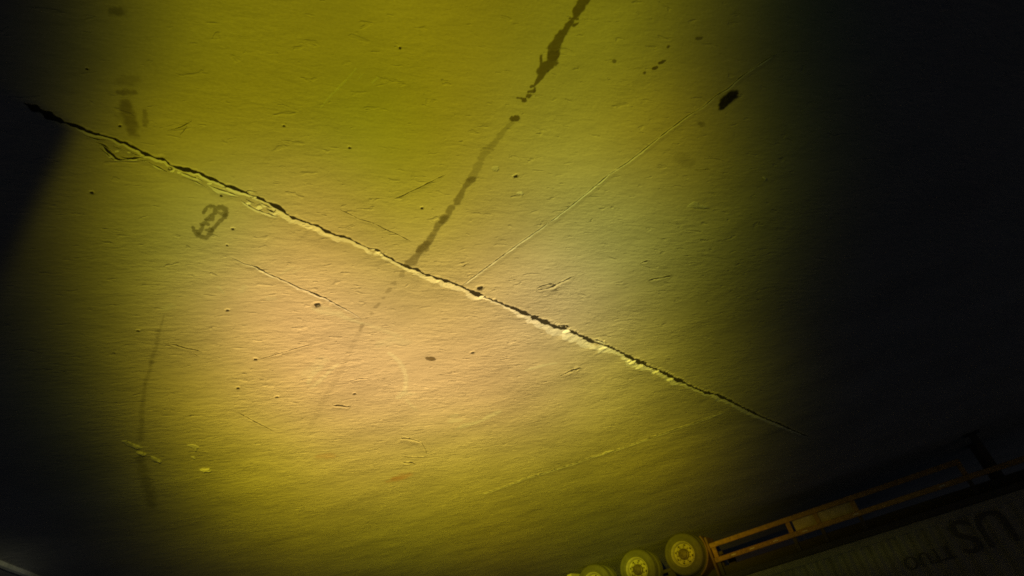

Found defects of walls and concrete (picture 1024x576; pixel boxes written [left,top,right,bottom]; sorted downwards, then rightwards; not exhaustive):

damp [533,0,590,87]
crack [24,52,808,438]